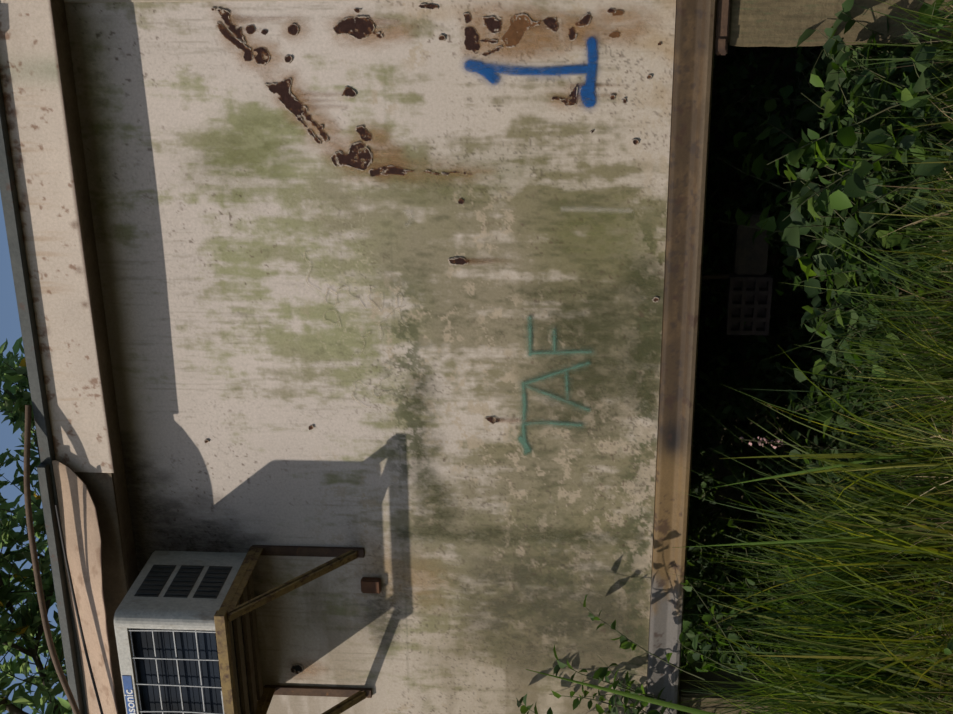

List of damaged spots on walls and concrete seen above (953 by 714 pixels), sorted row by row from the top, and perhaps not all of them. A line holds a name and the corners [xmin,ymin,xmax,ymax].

peeling [211,6,271,65]
spalling [333,16,400,39]
spalling [463,12,506,57]
peeling [264,78,329,145]
spalling [551,84,578,107]
spalling [330,141,397,171]
water stain [553,297,620,416]